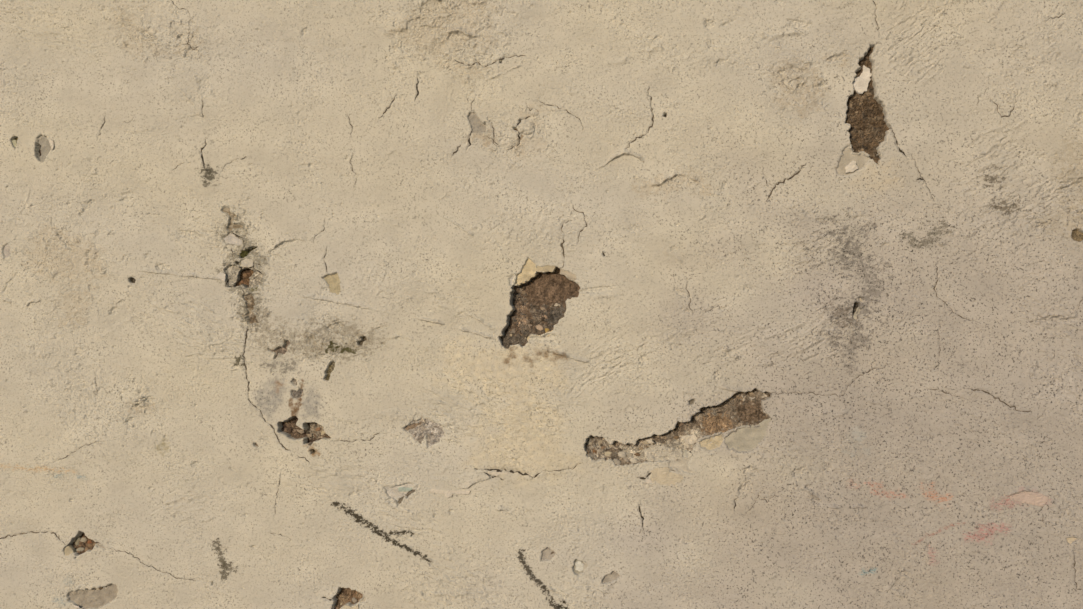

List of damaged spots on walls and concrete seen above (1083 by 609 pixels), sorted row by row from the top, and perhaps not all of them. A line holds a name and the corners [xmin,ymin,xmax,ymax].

flaking render [837,47,889,175]
crack [889,128,934,200]
flaking render [501,258,580,348]
flaking render [281,417,330,443]
flaking render [585,389,772,486]
flaking render [64,532,105,556]
peeling [69,584,118,609]
flaking render [334,587,365,609]